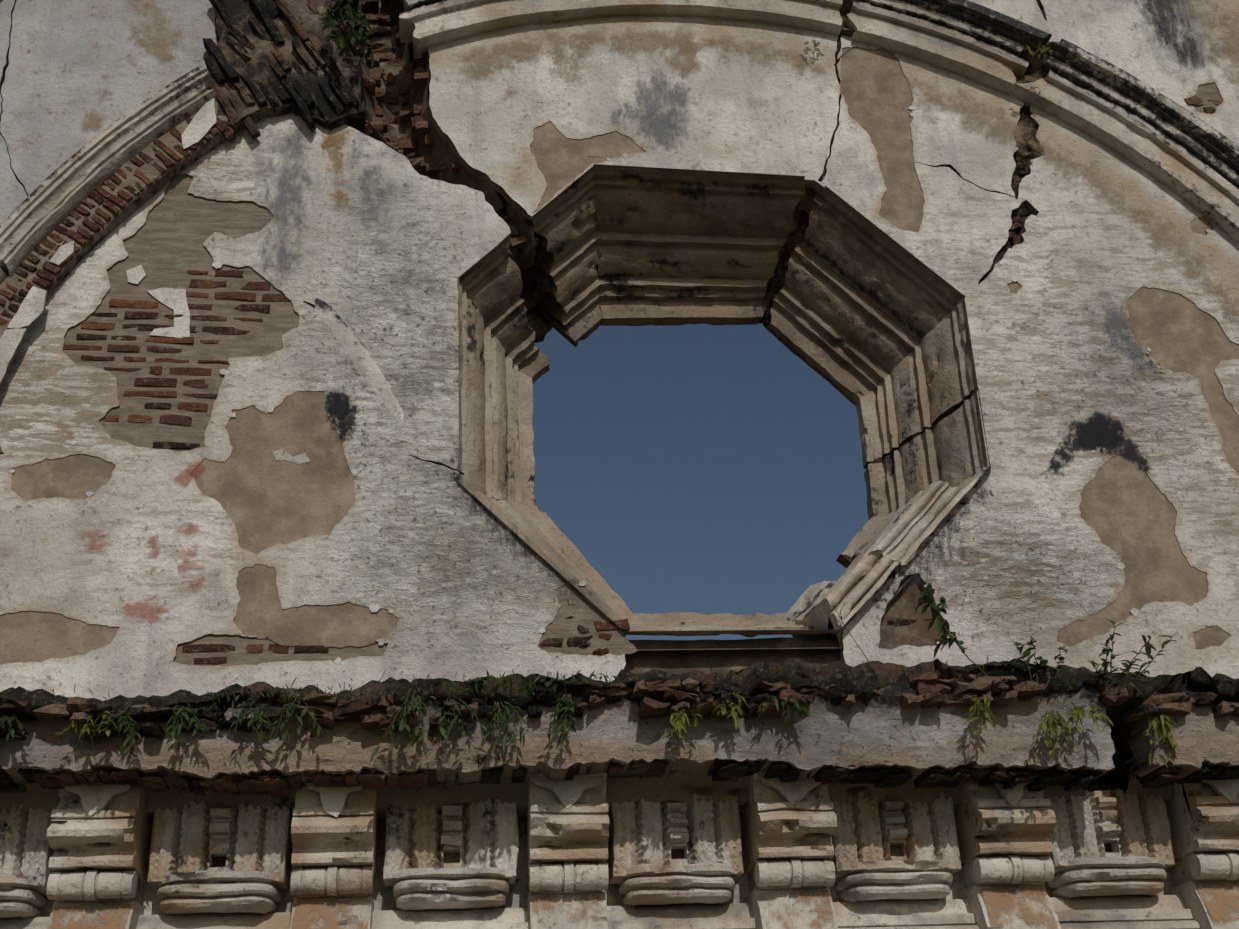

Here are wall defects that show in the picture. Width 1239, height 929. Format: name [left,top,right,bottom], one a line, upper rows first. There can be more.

crack [0,0,29,196]
crack [339,0,552,343]
water stain [549,31,776,149]
crack [758,0,864,328]
flaking render [838,47,924,232]
crack [927,0,1049,284]
water stain [1141,0,1239,66]
flaking render [63,175,398,667]
water stain [324,390,355,443]
water stain [1047,412,1151,473]
flaking render [1127,286,1239,475]
flaking render [1057,454,1208,647]